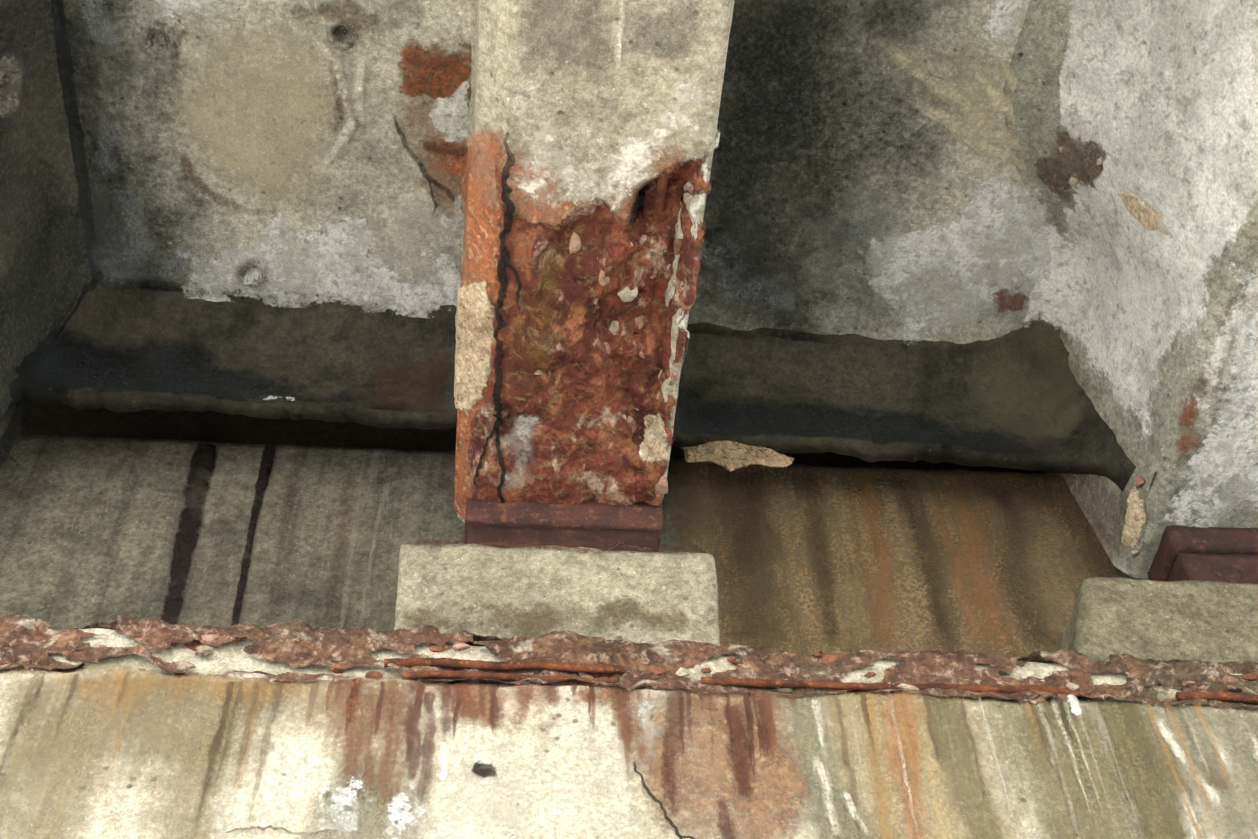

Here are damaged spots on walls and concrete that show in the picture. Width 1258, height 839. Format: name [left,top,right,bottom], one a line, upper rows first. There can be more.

crack [393,117,456,211]
crack [474,133,522,503]
rust [398,38,681,519]
spalling [454,154,794,507]
damp [517,0,1258,528]
rust [320,677,503,839]
rust [519,685,556,721]
crack [633,761,695,839]
rust [572,683,805,839]
damp [791,690,1003,839]
damp [1000,698,1258,839]